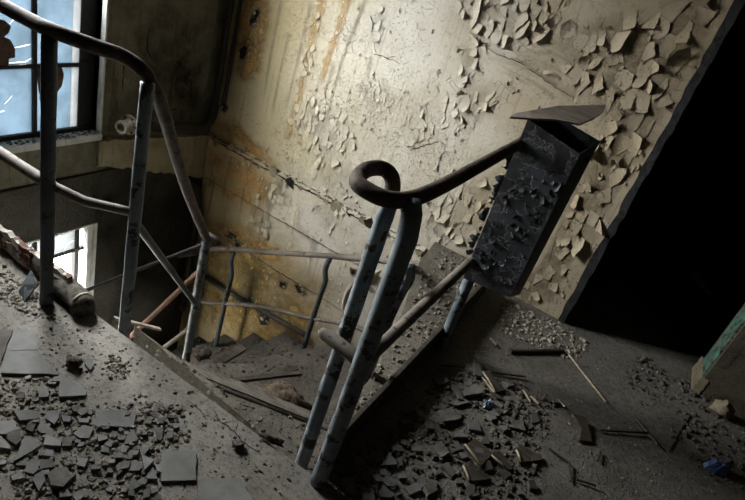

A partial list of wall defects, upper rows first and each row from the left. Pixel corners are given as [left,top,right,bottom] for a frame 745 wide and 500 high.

peeling [219,2,408,277]
corrosion [323,0,349,75]
peeling [394,0,720,304]
damp [204,251,312,341]